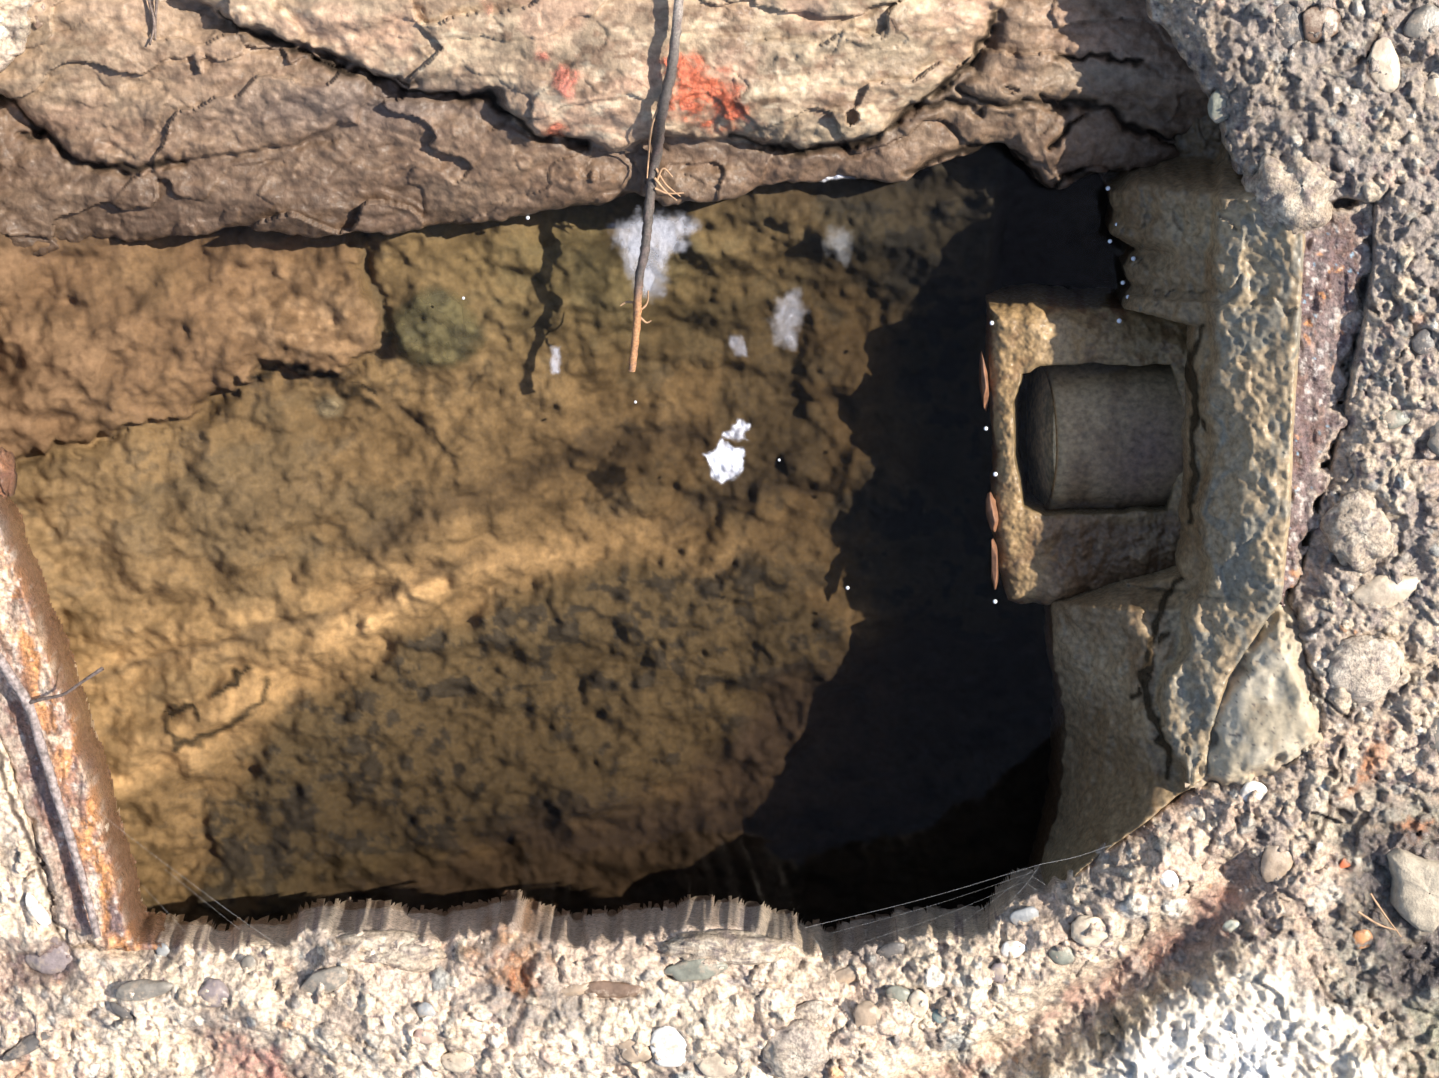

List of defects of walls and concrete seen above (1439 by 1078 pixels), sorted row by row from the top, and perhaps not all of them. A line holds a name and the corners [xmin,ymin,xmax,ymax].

crack [0,94,183,174]
crack [218,12,588,146]
crack [729,12,1176,189]
peeling [706,420,750,483]